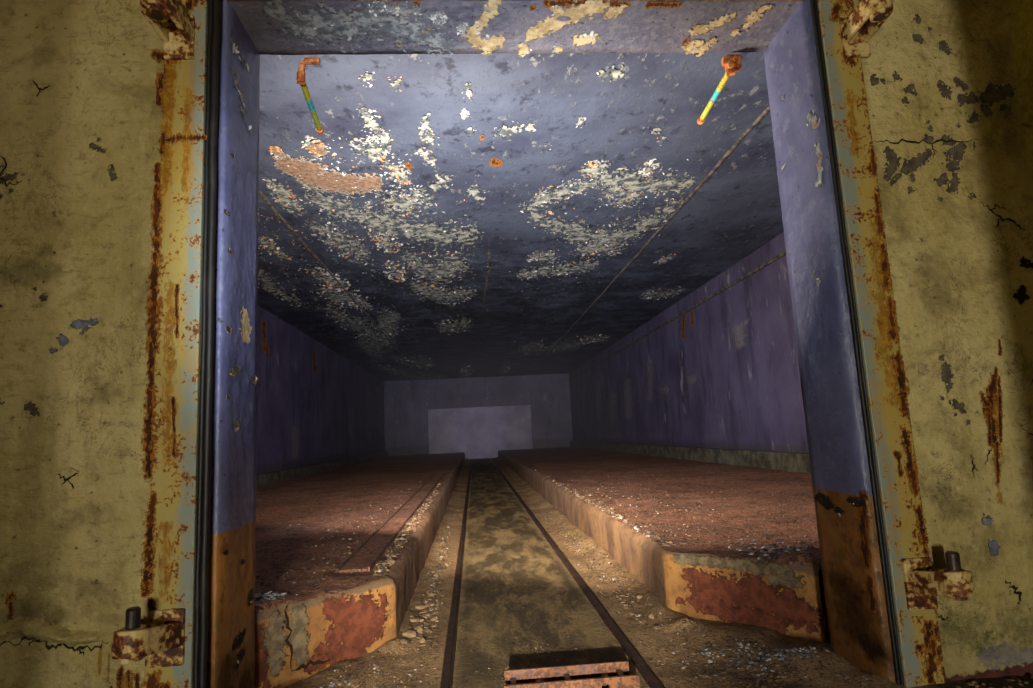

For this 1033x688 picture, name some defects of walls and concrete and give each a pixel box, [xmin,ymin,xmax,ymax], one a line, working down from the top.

peeling [260,0,628,58]
peeling [597,65,624,82]
peeling [681,5,774,57]
crack [874,139,978,158]
peeling [882,76,1017,202]
rust [140,48,207,479]
peeling [258,105,700,374]
rust [871,192,910,413]
rust [980,339,1005,503]
rust [140,492,173,611]
rust [893,427,930,557]
crack [0,636,108,656]